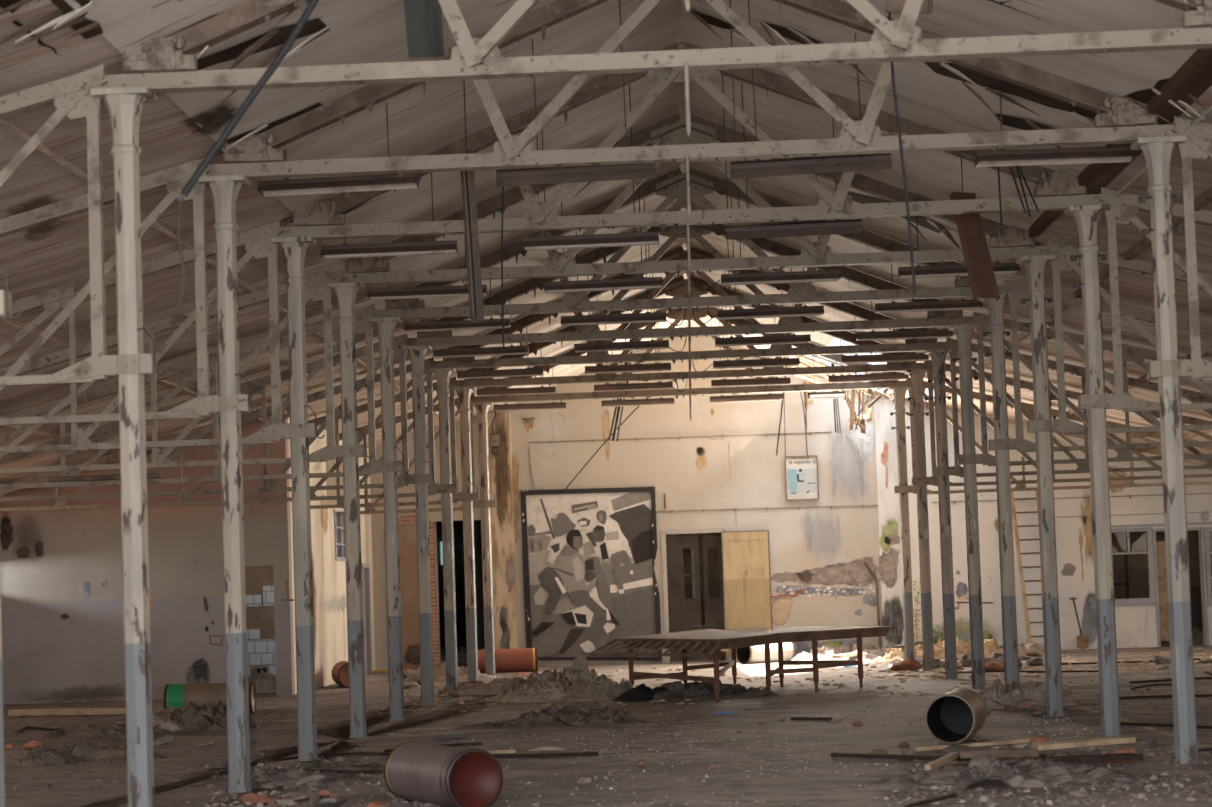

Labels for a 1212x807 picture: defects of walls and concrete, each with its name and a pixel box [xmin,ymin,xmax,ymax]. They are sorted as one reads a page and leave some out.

flaking render [771,535,900,626]